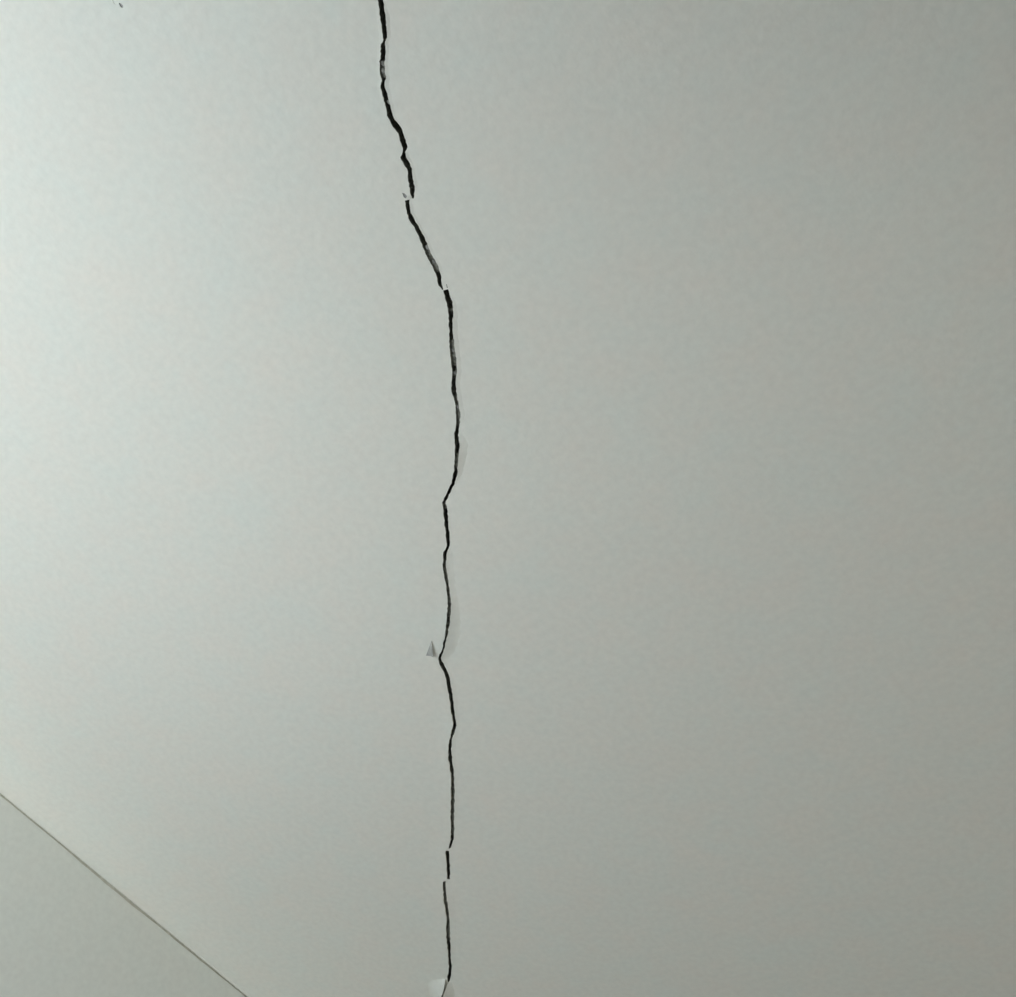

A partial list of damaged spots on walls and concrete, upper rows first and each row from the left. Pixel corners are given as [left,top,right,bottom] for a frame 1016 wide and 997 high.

crack [376,0,465,997]